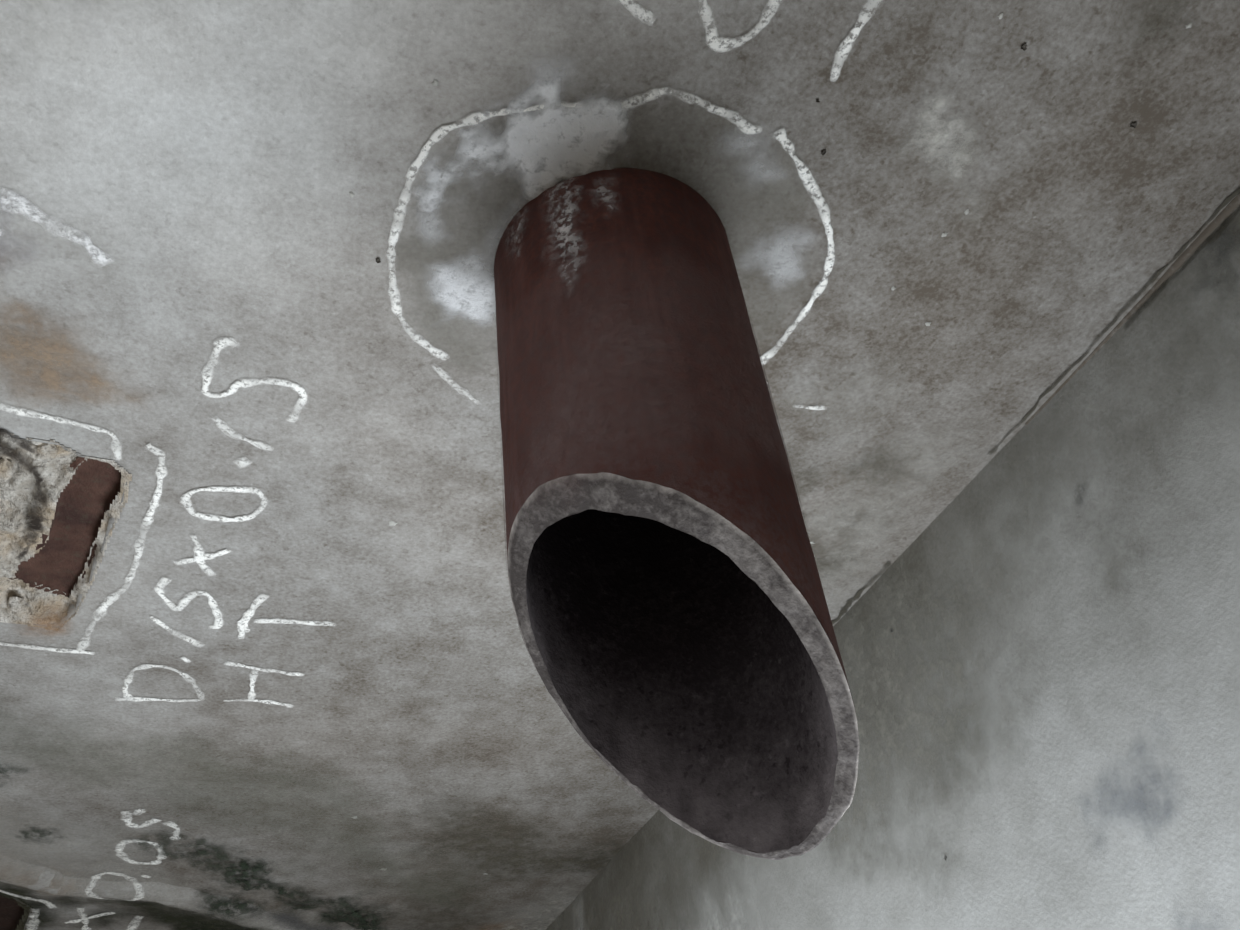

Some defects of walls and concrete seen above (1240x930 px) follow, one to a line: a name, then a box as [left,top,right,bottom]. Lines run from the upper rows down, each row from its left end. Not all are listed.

leakage [421,81,627,246]
leakage [414,238,495,352]
spalling [0,433,132,631]
spalling [0,896,34,930]
leakage [0,860,324,930]